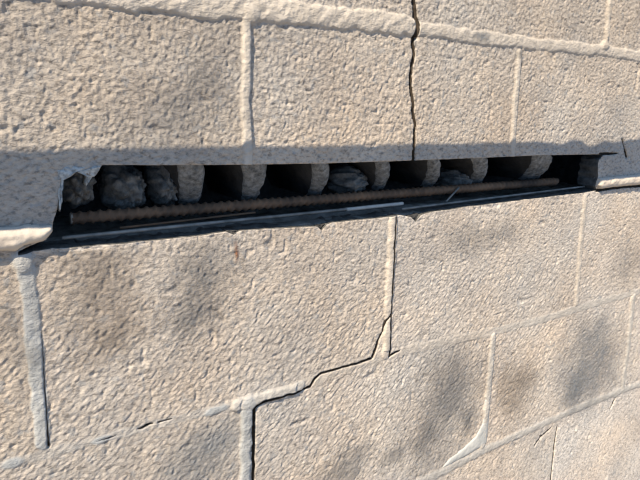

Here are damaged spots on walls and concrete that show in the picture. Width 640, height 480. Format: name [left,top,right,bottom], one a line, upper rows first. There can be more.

crack [409,0,420,161]
spalling [57,166,101,212]
spalling [69,178,559,225]
crack [251,217,400,480]